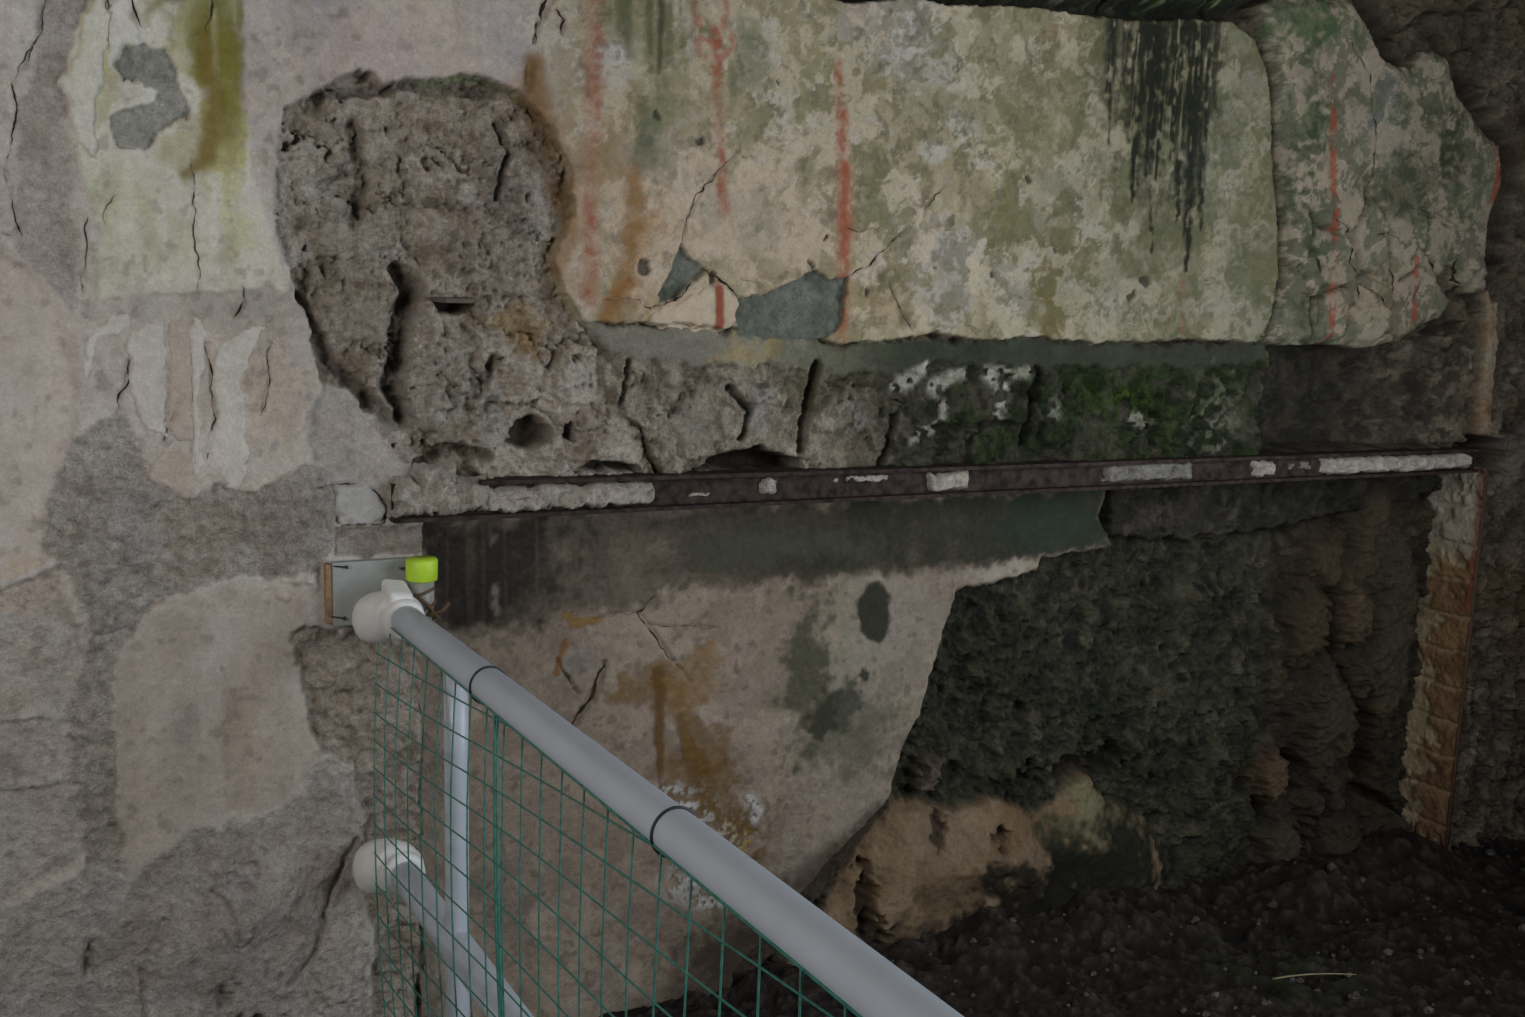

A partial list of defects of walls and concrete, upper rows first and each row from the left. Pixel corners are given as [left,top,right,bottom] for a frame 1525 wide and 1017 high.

leakage [184,11,241,176]
leakage [1106,18,1221,272]
crack [605,153,753,309]
crack [1304,215,1461,338]
flaking render [41,72,1474,874]
rust [556,613,602,675]
crack [560,662,605,725]
crack [616,585,711,672]
leakage [661,783,723,835]
rust [647,666,762,860]
leakage [668,866,723,909]
flaking render [364,893,420,1017]